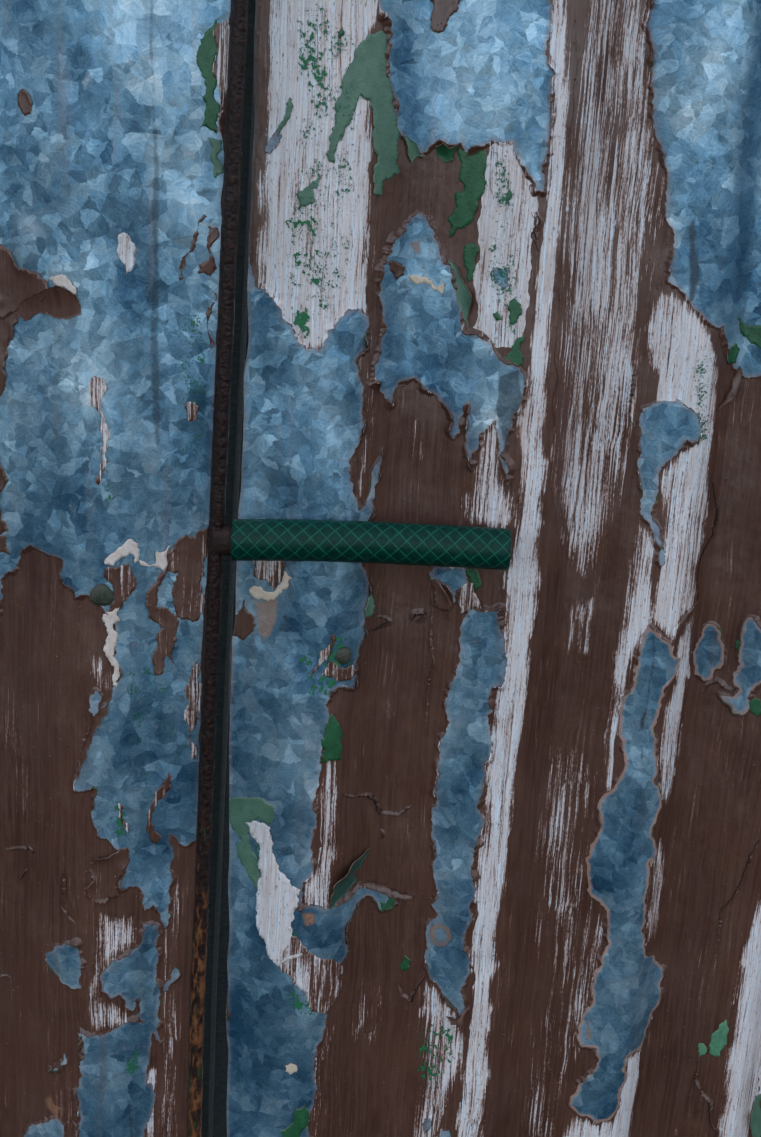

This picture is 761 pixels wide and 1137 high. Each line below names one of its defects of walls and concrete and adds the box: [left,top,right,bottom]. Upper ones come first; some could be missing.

peeling [0,0,231,1137]
peeling [226,0,761,1137]